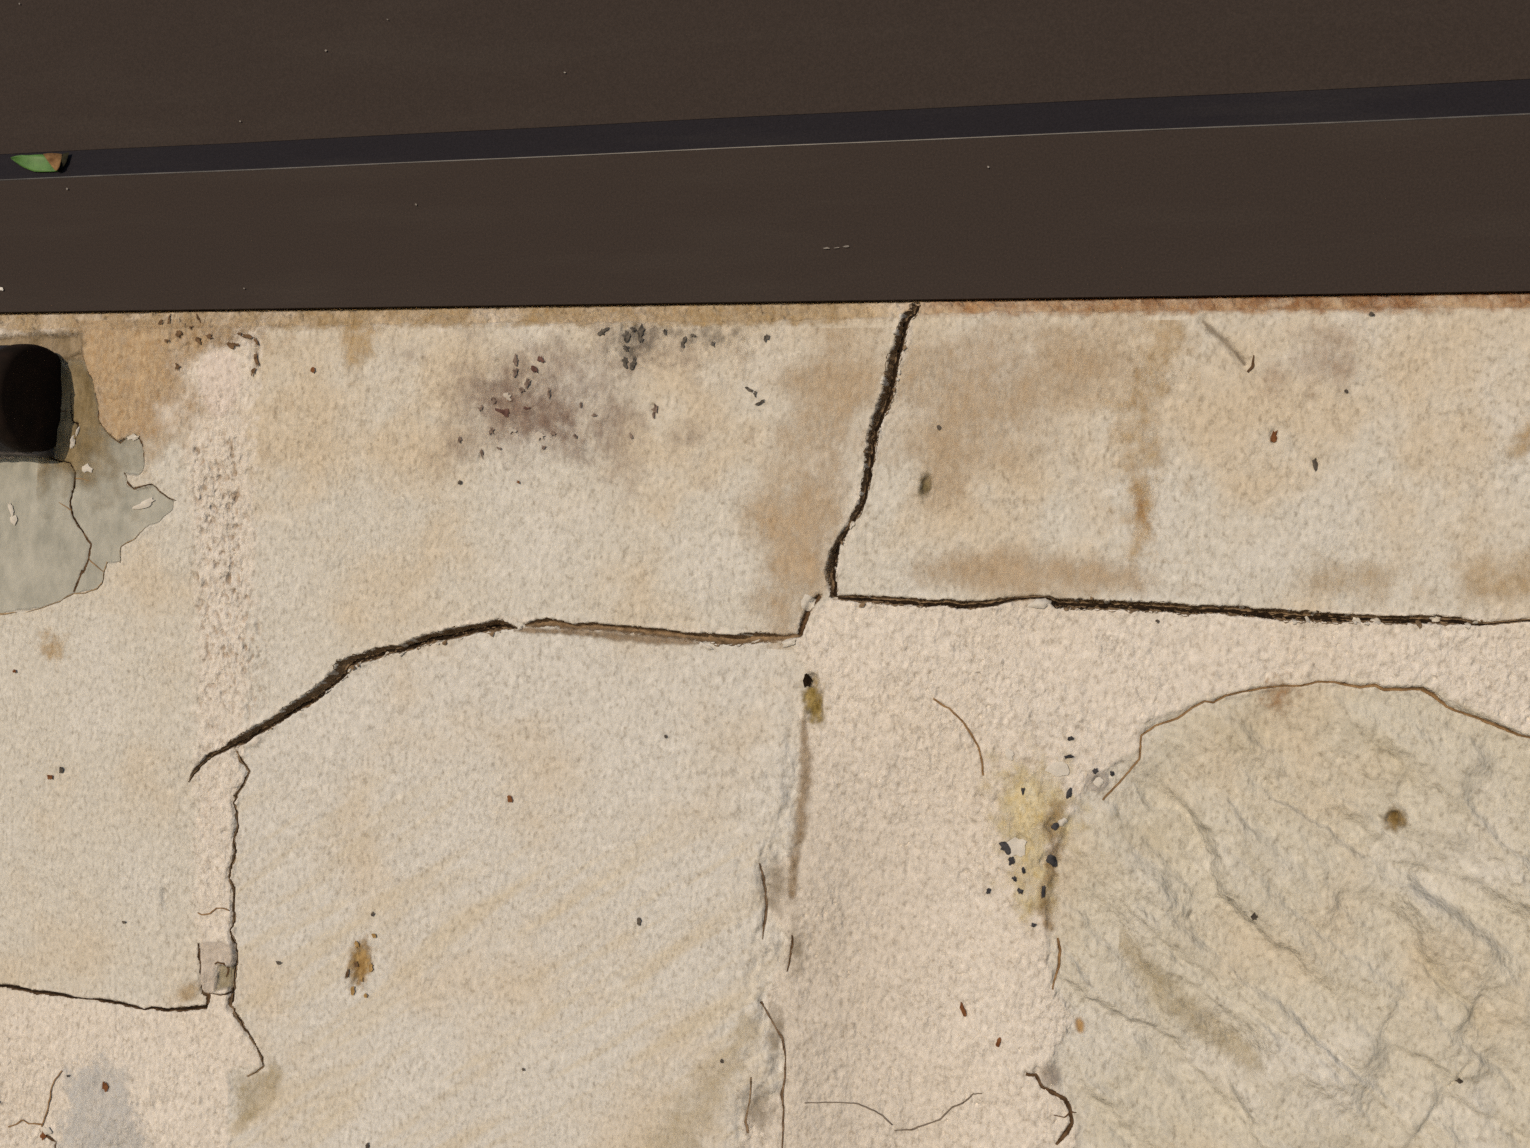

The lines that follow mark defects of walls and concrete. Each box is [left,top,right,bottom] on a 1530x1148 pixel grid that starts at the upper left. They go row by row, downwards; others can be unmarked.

water stain [472,354,633,457]
peeling [0,332,176,615]
crack [0,304,1530,1077]
crack [804,1093,982,1131]
crack [1026,1066,1076,1145]